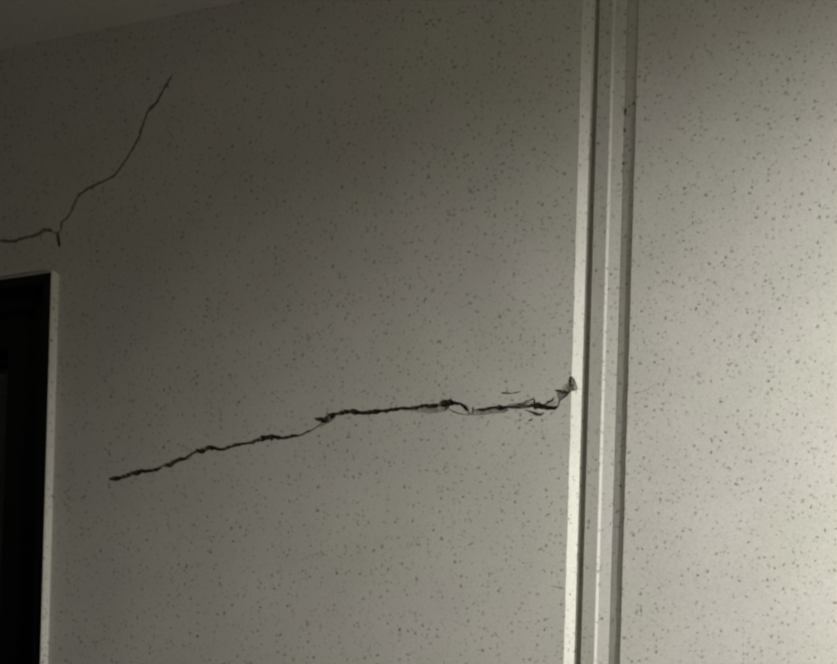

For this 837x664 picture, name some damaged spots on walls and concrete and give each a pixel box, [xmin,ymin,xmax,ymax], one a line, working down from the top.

crack [0,73,173,247]
crack [109,389,560,481]